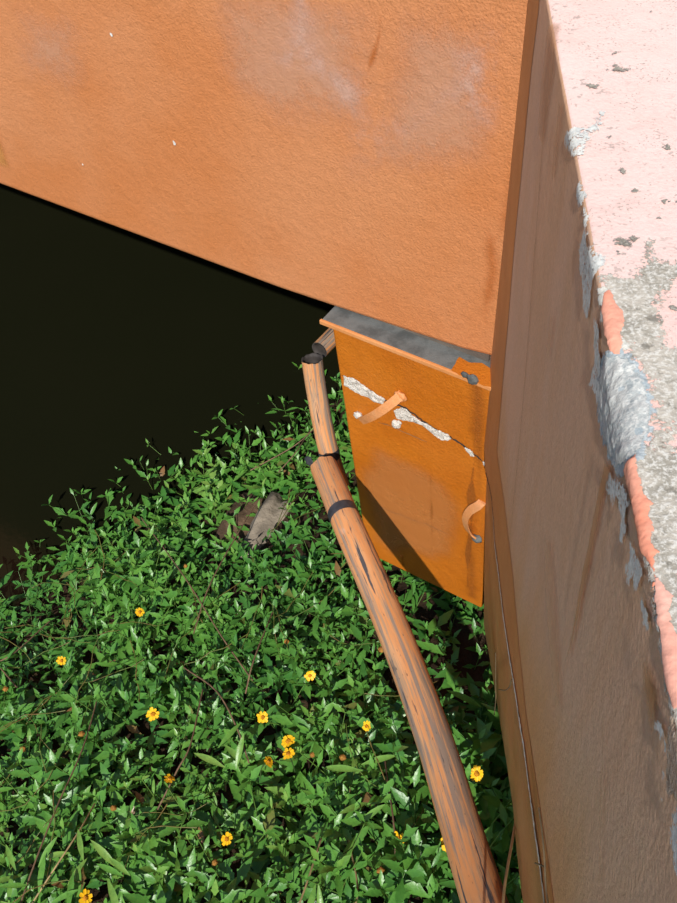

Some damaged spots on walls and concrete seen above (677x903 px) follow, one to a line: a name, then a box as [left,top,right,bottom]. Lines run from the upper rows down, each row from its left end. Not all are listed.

peeling [564,110,611,157]
peeling [576,182,677,664]
peeling [654,720,666,752]